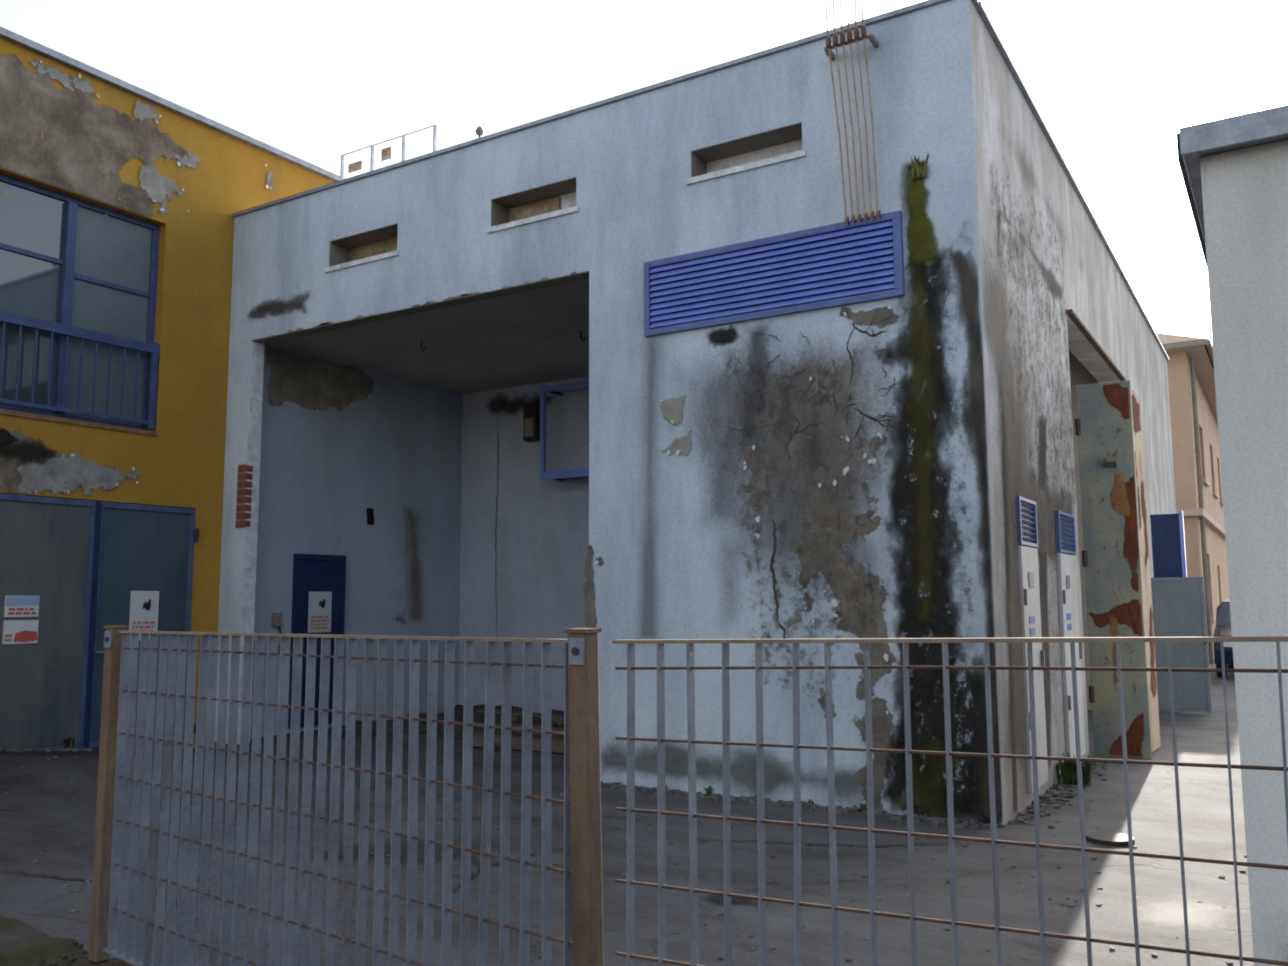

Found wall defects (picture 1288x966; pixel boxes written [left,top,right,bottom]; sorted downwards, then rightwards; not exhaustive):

peeling [0,54,201,217]
leakage [903,165,912,220]
leakage [248,294,307,318]
peeling [840,304,900,328]
leakage [996,237,1062,313]
peeling [265,321,375,411]
spalling [0,428,140,496]
peeling [660,395,692,456]
crack [770,520,786,639]
peeling [723,360,932,813]
leakage [715,251,1072,824]
corrosion [1089,383,1157,697]